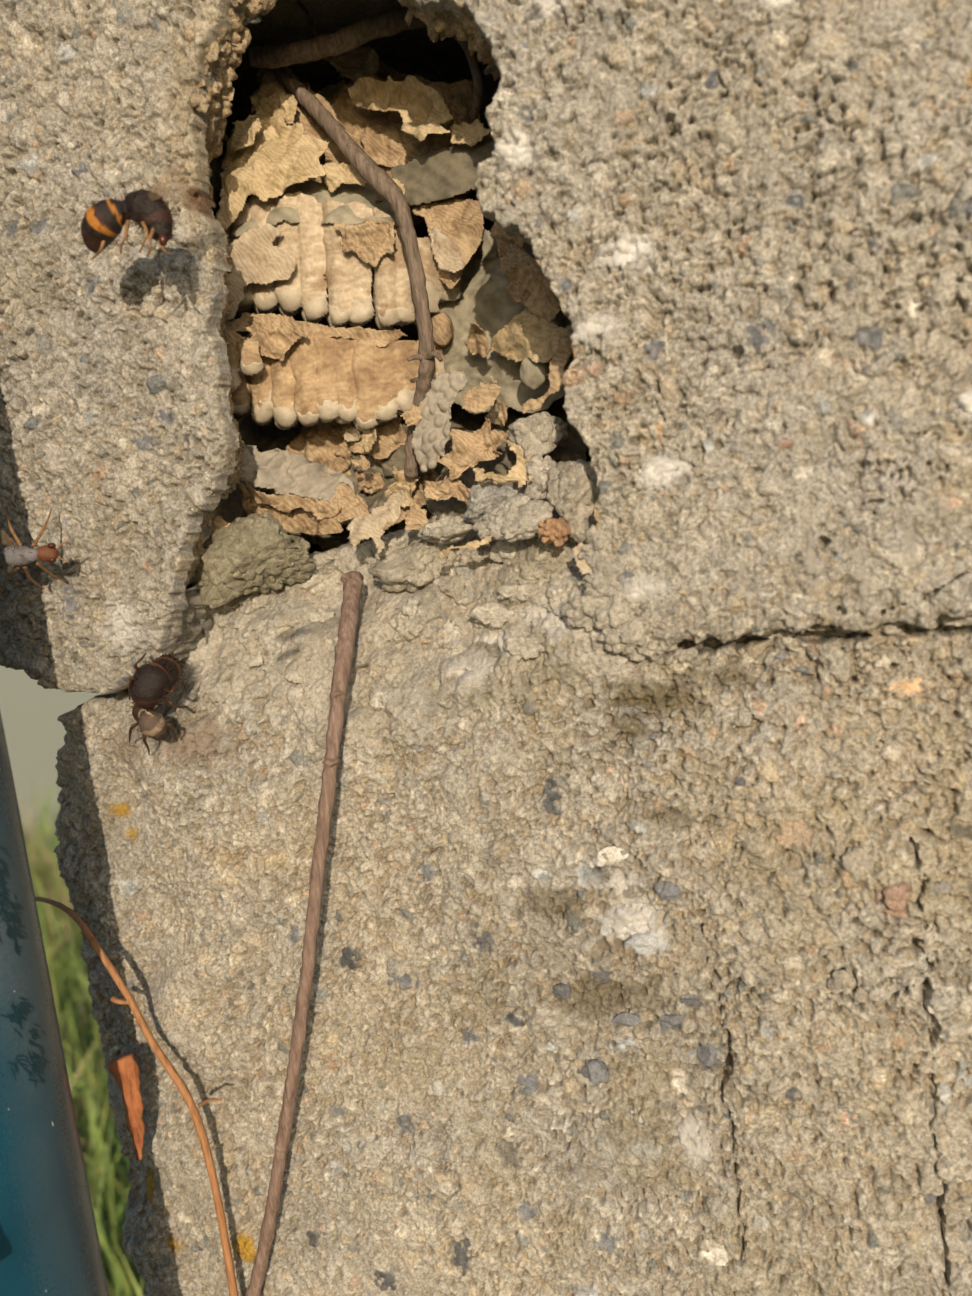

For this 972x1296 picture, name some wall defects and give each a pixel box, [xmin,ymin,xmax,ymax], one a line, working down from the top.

spalling [189,0,277,204]
spalling [398,0,501,82]
spalling [216,250,234,339]
spalling [184,364,246,589]
spalling [161,500,698,752]
crack [677,572,972,654]
crack [689,906,747,1261]
crack [839,837,952,1296]